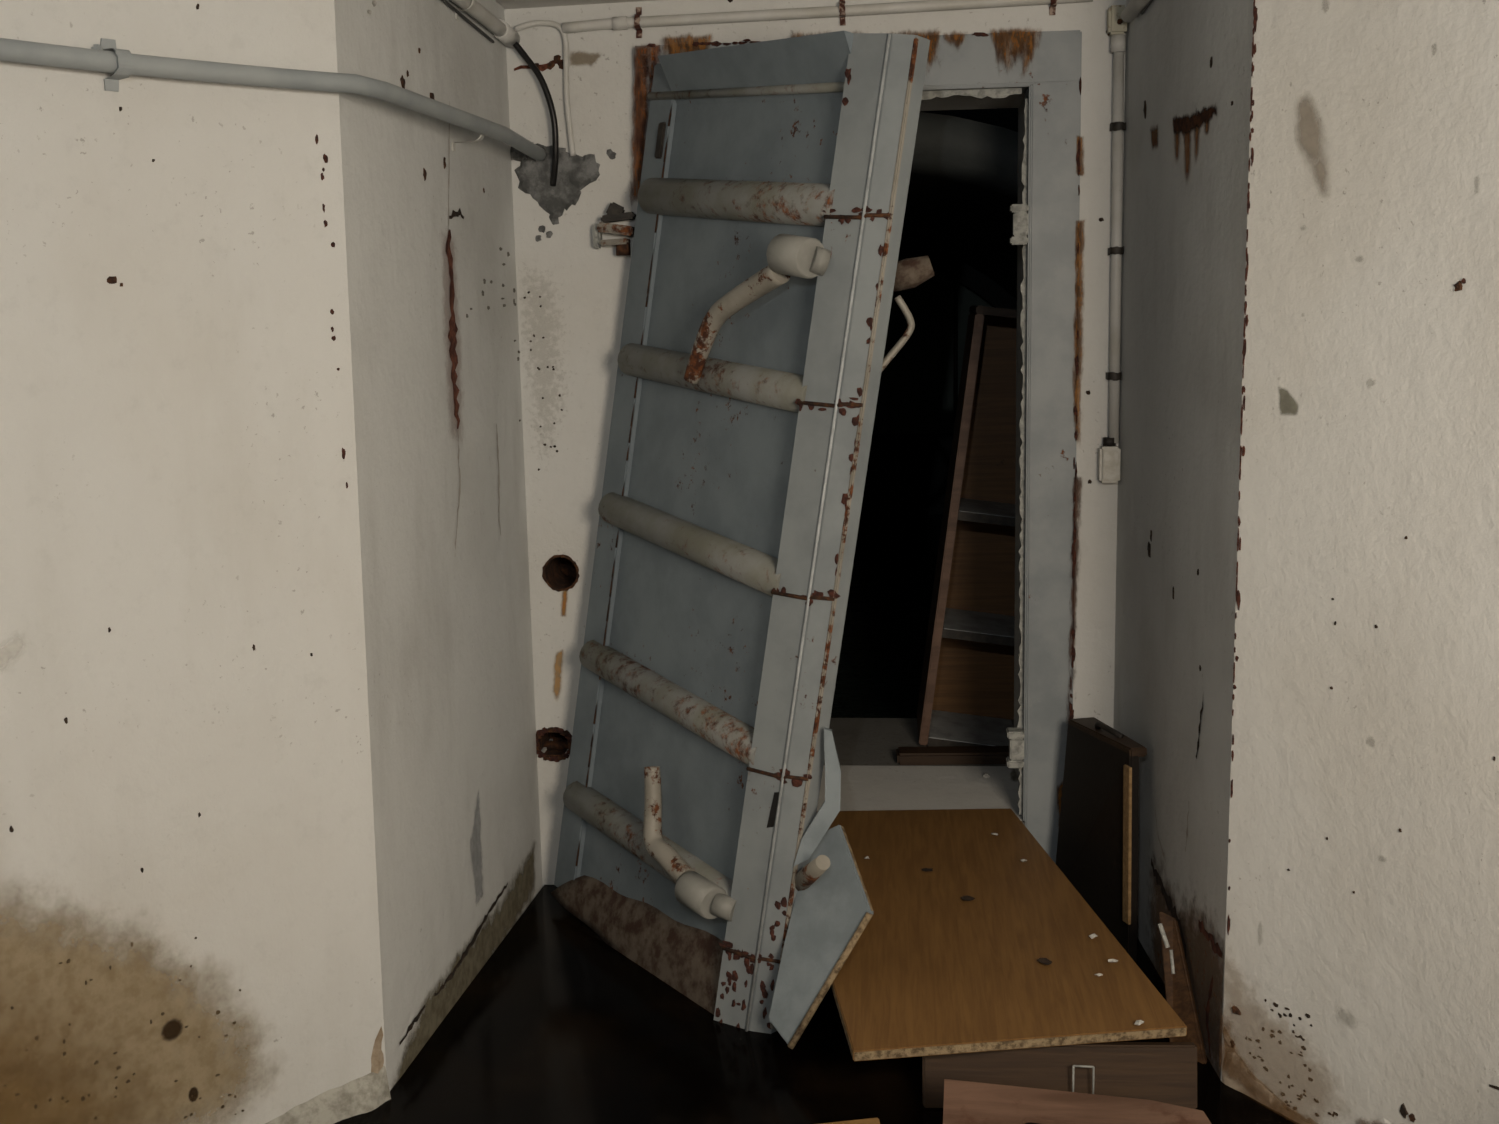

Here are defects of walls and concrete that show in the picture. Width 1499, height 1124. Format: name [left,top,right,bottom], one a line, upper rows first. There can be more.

corrosion [899,29,1041,71]
corrosion [631,34,761,202]
corrosion [842,68,851,106]
corrosion [1076,136,1084,196]
corrosion [1150,106,1217,178]
corrosion [1068,221,1084,721]
water stain [0,904,254,1124]